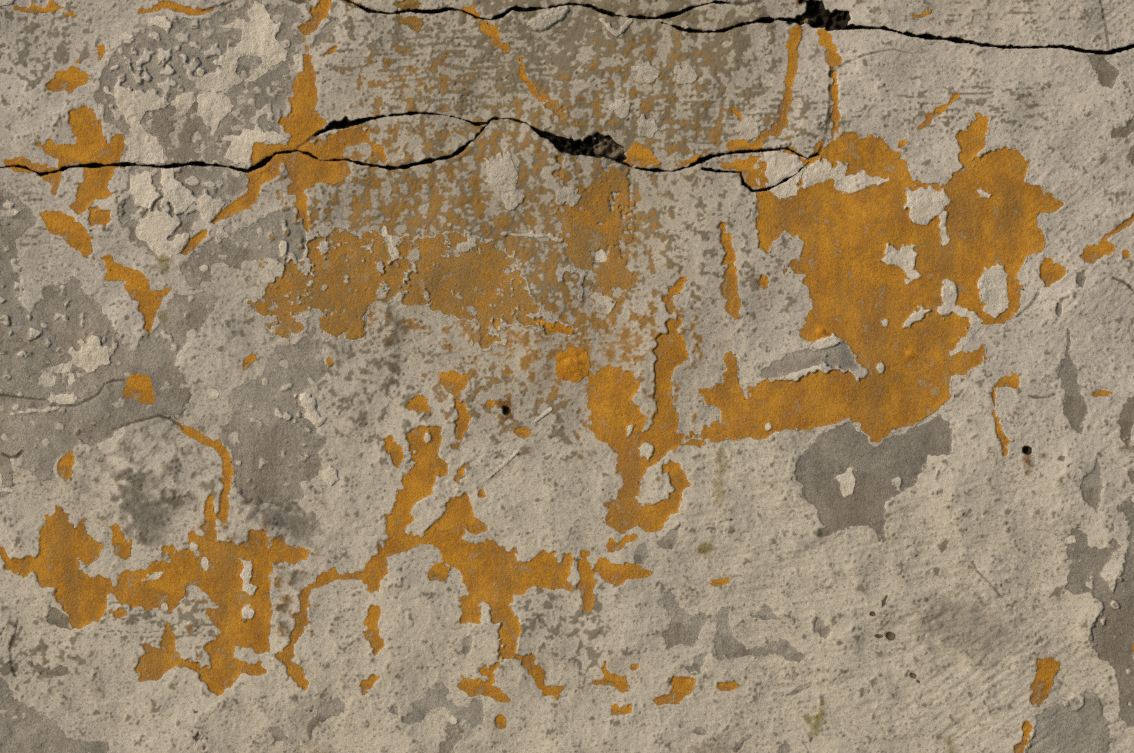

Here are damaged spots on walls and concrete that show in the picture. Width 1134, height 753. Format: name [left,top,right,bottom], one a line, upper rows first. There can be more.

crack [0,0,1134,192]
flaking render [0,0,578,696]
peeling [274,0,1067,753]
flaking render [1055,302,1112,434]
flaking render [1080,459,1103,513]
flaking render [1118,396,1134,447]
flaking render [1014,470,1134,753]
flaking render [268,726,288,746]